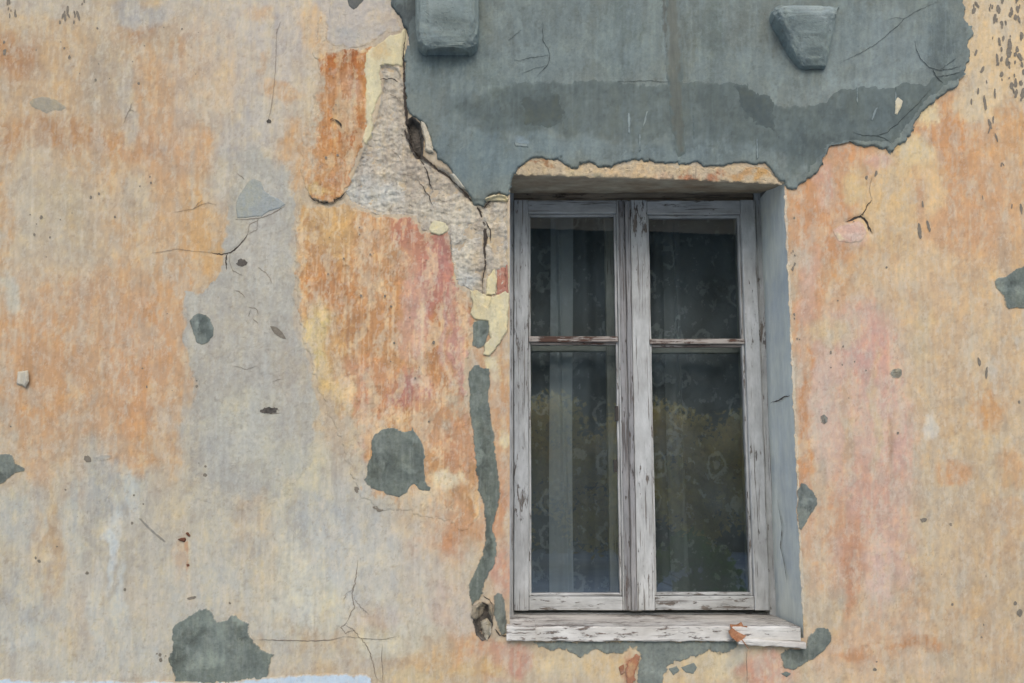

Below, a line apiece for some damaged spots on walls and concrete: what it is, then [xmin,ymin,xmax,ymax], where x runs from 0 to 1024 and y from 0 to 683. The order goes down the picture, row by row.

crack [860,45,960,144]
crack [382,29,494,294]
crack [846,179,872,232]
crack [154,208,281,322]
peeling [167,0,508,531]
crack [262,561,393,678]
flaking render [471,602,494,641]
peeling [619,654,640,683]